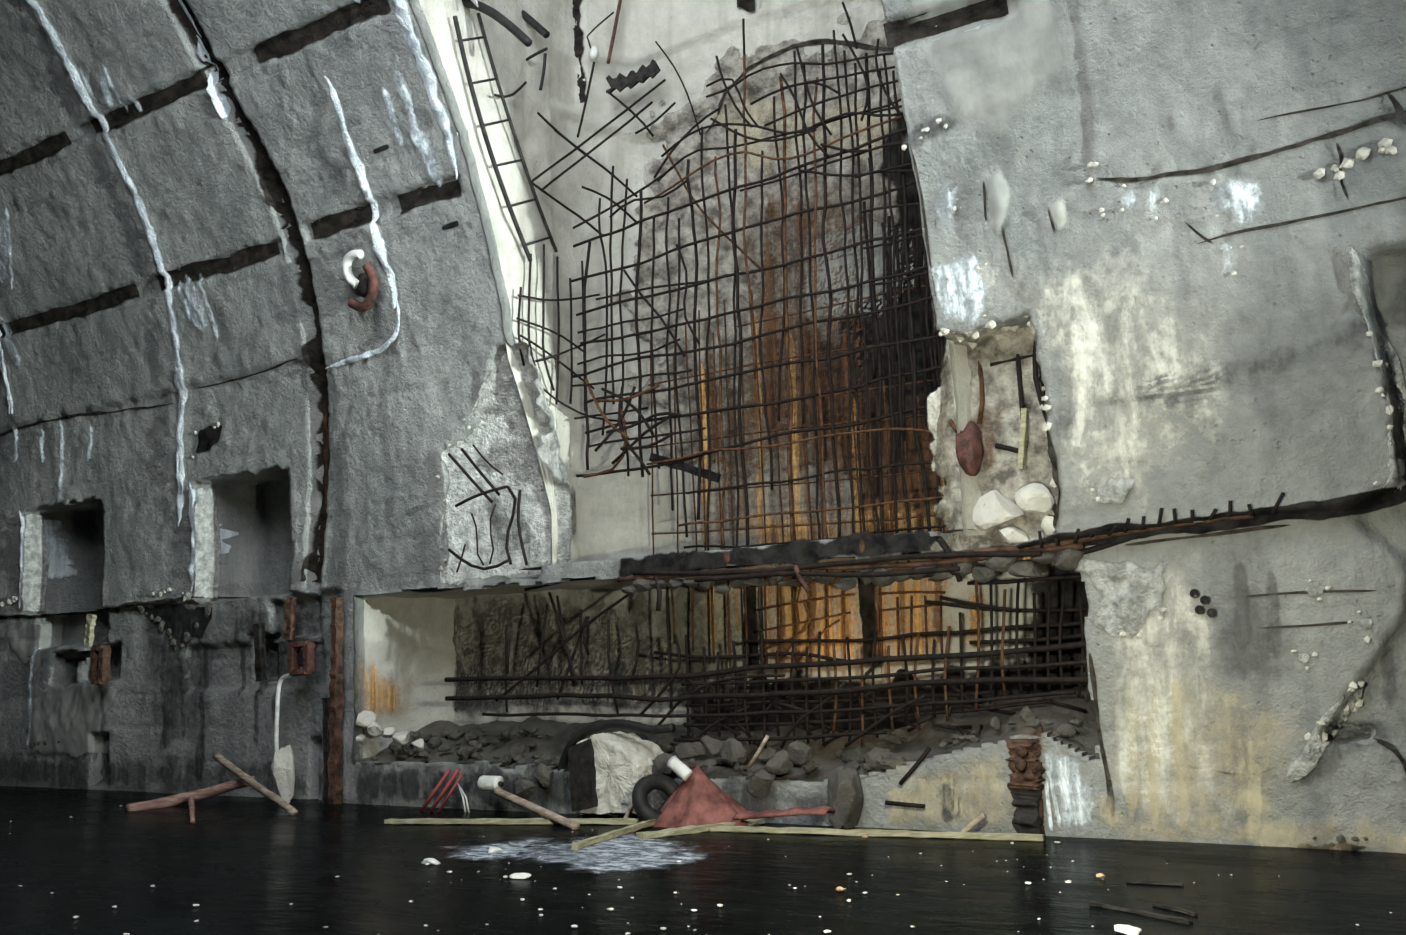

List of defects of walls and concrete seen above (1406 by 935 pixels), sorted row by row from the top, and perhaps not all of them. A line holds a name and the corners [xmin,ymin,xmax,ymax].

crack [1097,86,1406,244]
crack [0,358,298,436]
spalling [435,0,1254,749]
corrosion [619,323,947,663]
crack [1374,738,1406,773]